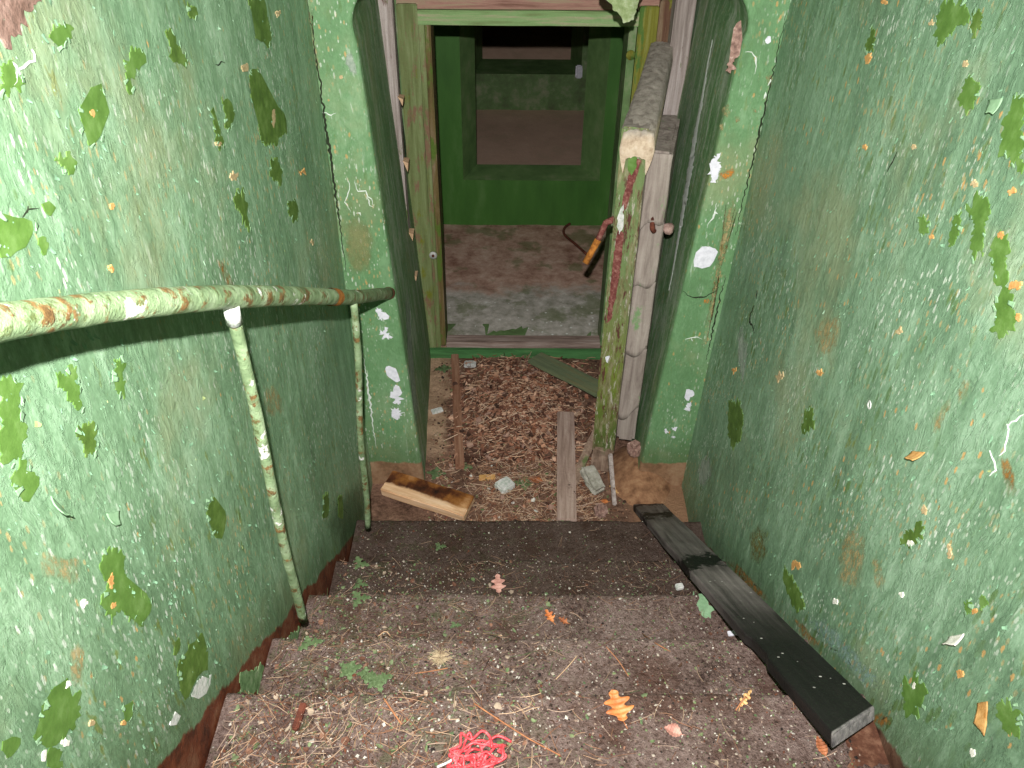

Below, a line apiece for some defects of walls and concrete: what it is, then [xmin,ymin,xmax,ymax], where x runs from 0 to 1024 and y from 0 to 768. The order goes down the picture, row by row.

spalling [0,0,52,104]
peeling [0,84,119,268]
peeling [241,63,299,187]
crack [307,0,374,270]
crack [669,11,788,359]
peeling [914,0,1024,196]
peeling [916,179,1023,339]
peeling [0,374,65,502]
peeling [1,505,218,768]
peeling [770,552,808,614]